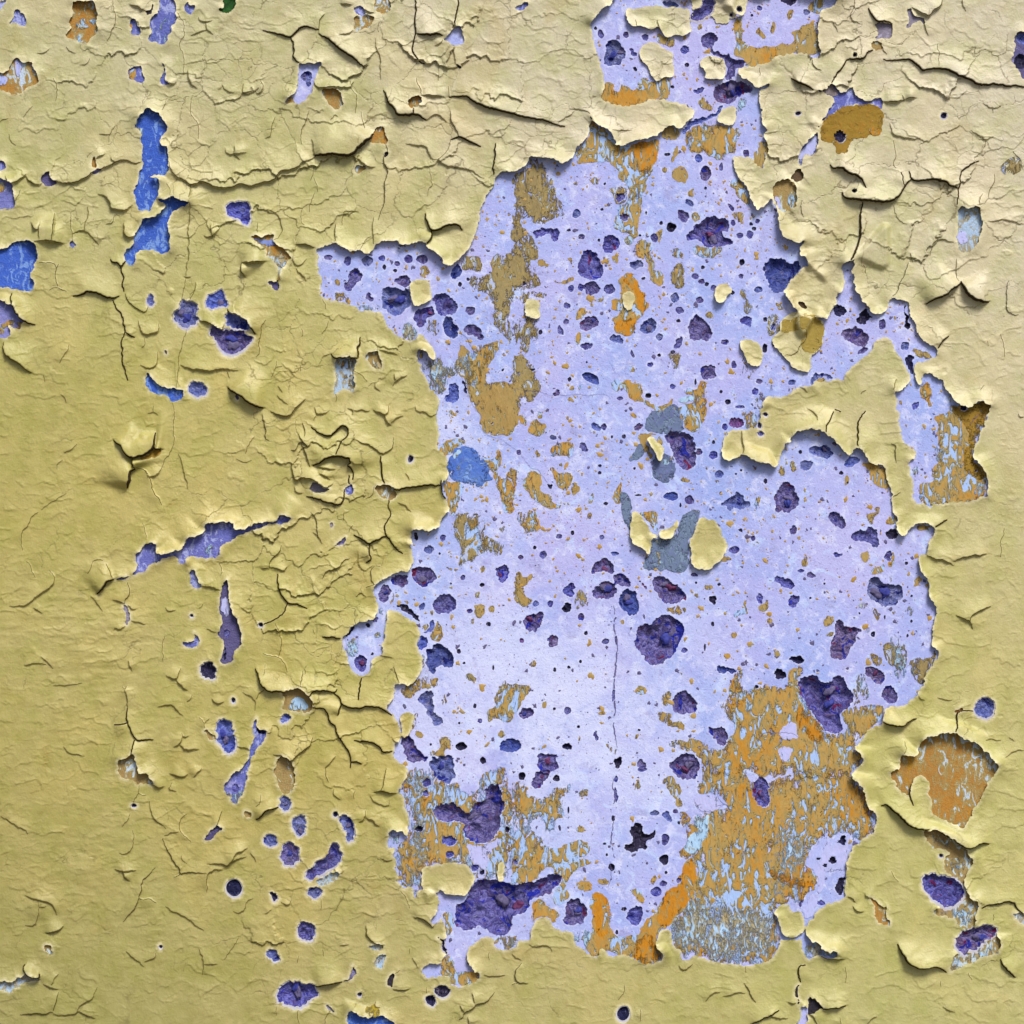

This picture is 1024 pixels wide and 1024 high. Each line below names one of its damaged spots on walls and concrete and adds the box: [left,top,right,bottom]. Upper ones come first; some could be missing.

peeling [0,150,87,349]
peeling [56,0,248,276]
crack [5,0,588,612]
crack [791,0,1024,110]
crack [830,95,1022,273]
crack [893,239,1019,357]
crack [87,559,143,630]
peeling [105,472,408,681]
peeling [225,0,1024,1024]
crack [114,545,398,975]
crack [22,964,97,1019]